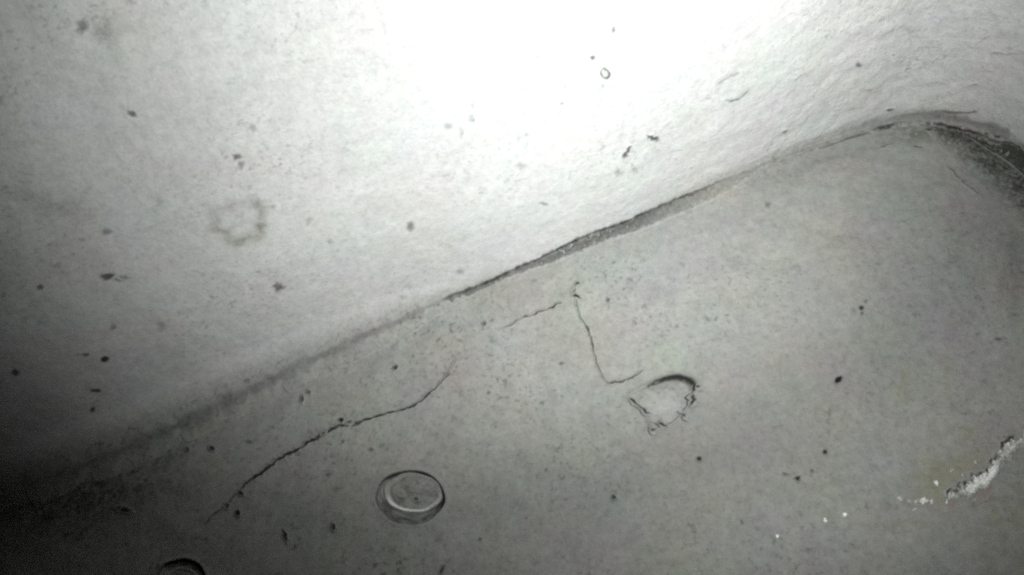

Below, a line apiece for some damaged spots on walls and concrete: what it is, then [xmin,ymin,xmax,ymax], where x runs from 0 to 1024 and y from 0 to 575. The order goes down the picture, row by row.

crack [499,279,645,387]
crack [205,358,458,525]
peeling [622,370,703,436]
peeling [897,430,1024,513]